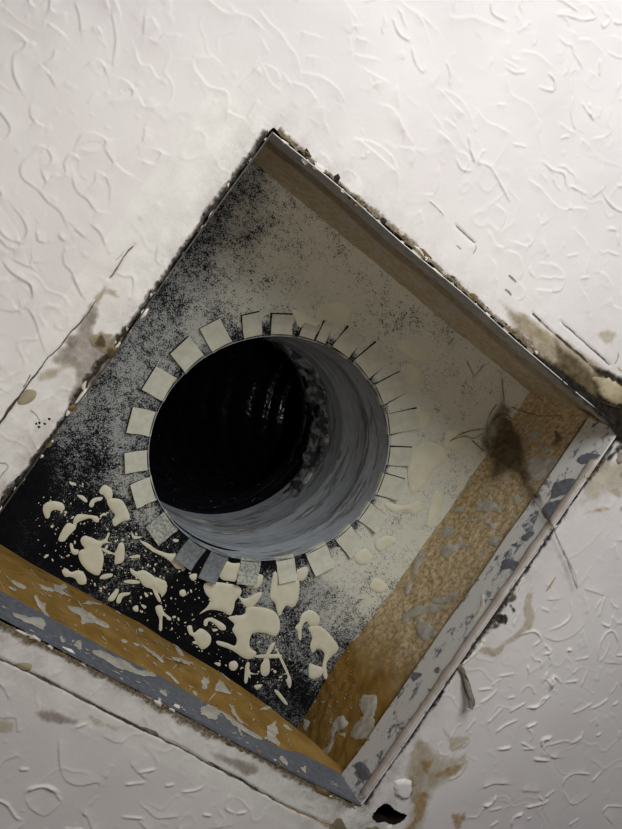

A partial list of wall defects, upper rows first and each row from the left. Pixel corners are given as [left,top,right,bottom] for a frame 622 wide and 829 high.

crack [0,246,134,424]
leakage [46,290,116,402]
spalling [0,128,555,510]
leakage [511,314,622,460]
spalling [0,437,617,809]
crack [0,658,331,827]